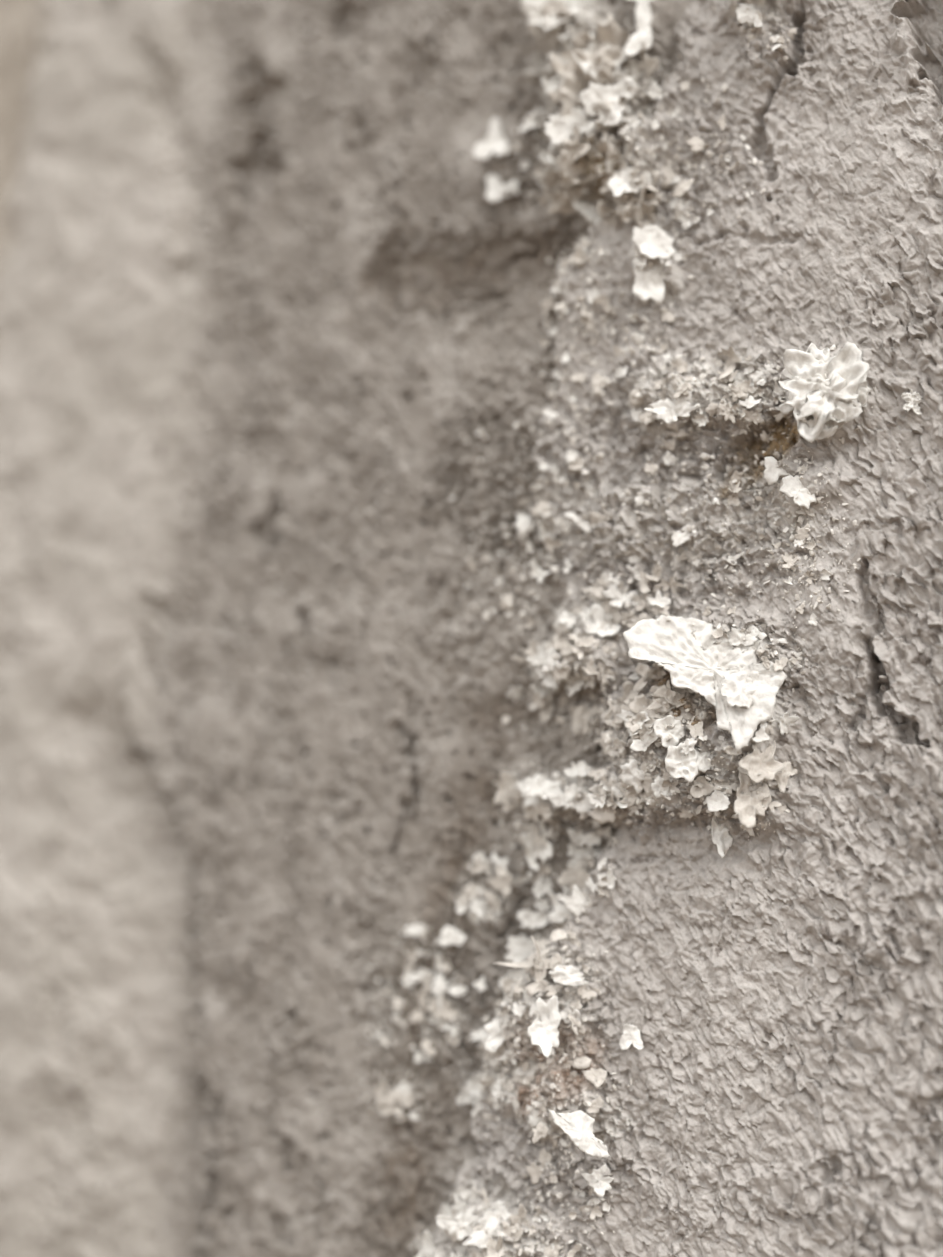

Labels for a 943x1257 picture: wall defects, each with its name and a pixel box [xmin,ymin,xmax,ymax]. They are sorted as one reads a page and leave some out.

flaking render [340,0,881,1257]